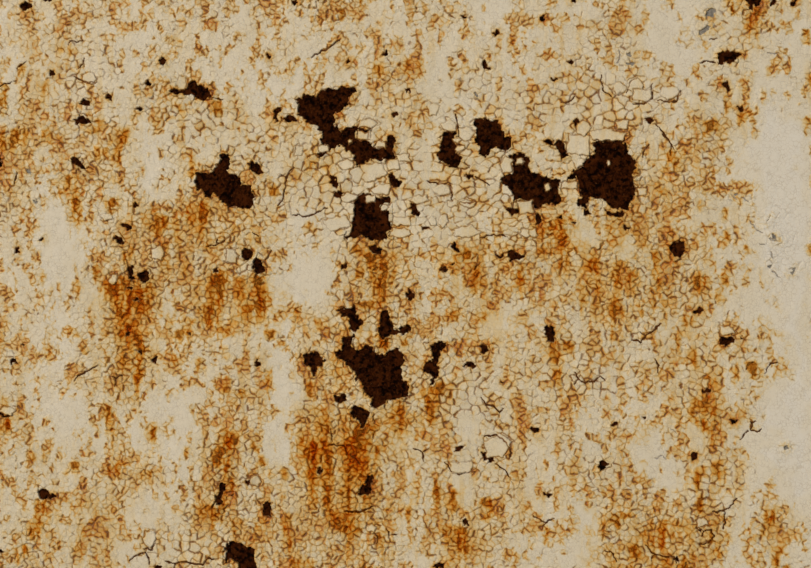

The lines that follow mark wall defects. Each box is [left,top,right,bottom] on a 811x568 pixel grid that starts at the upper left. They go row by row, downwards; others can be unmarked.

crack [600,78,681,105]
peeling [189,144,270,214]
crack [278,167,328,217]
peeling [265,81,483,259]
peeling [427,103,648,267]
rust [118,292,142,350]
rust [203,275,226,322]
rust [249,276,266,312]
peeling [294,280,425,434]
rust [347,425,368,458]
crack [698,498,738,545]
crack [129,545,214,568]